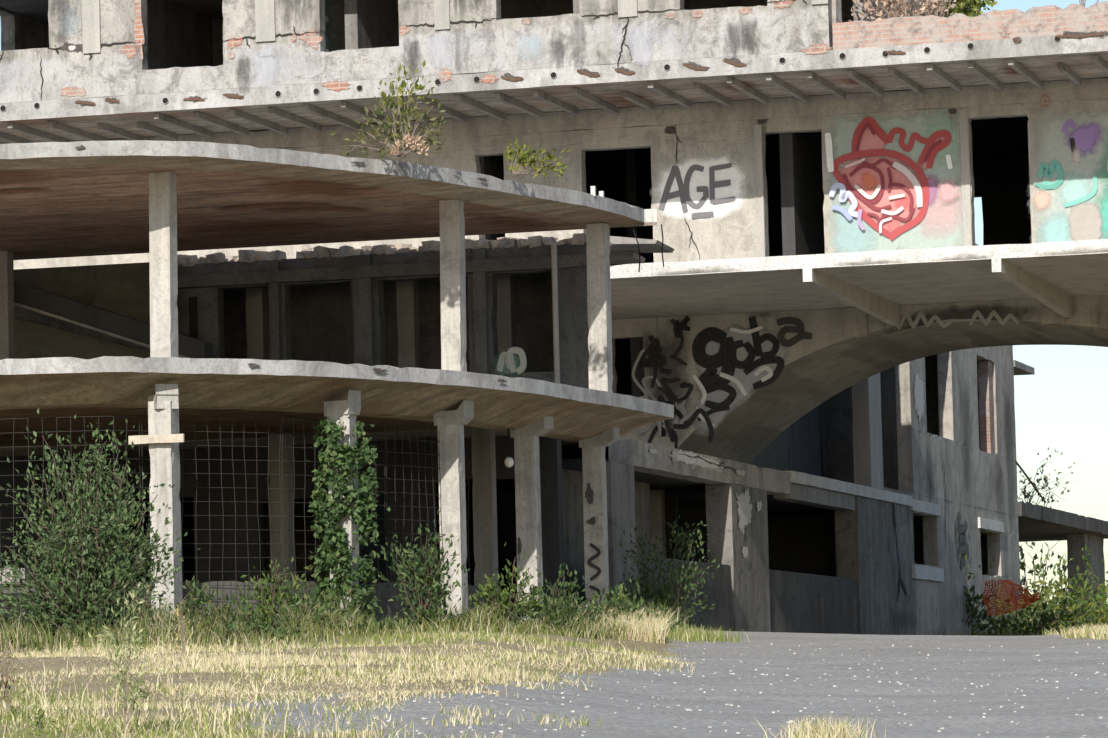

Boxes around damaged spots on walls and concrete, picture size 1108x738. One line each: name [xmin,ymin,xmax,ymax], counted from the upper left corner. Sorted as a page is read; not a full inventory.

crack [40,47,62,101]
spalling [54,42,83,52]
crack [89,41,135,61]
peeling [121,0,145,59]
crack [580,9,681,67]
peeling [650,449,745,476]
peeling [735,489,763,558]